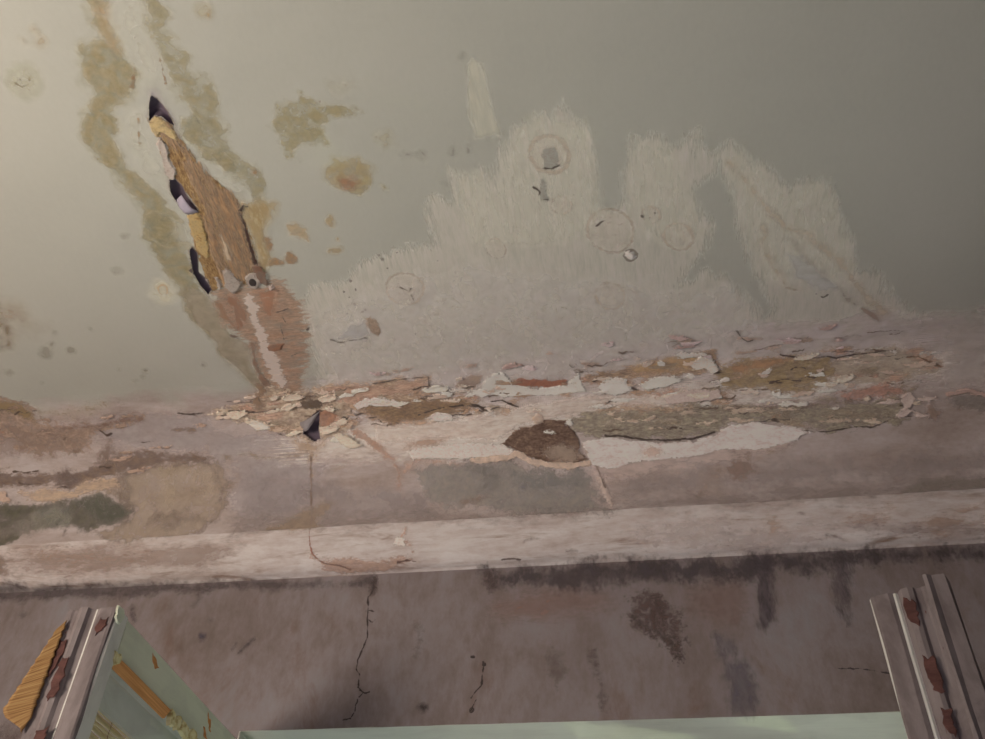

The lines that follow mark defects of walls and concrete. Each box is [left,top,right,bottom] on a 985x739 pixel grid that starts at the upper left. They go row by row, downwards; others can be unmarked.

leakage [79,0,265,388]
peeling [146,116,274,294]
leakage [0,396,228,545]
spalling [178,323,985,478]
crack [309,454,377,720]
mould [629,591,687,663]
leakage [752,554,774,629]